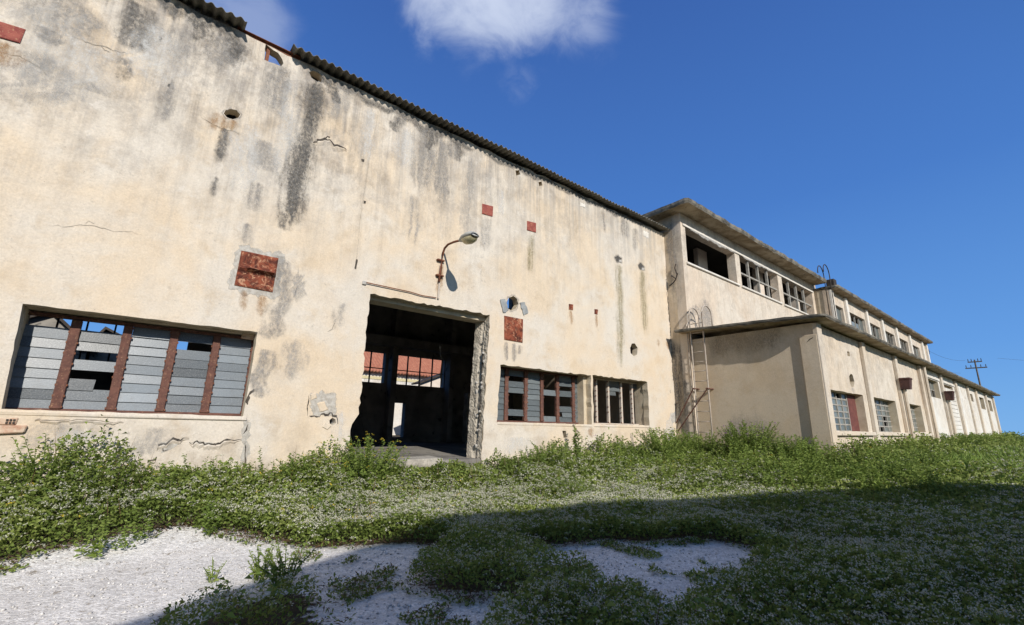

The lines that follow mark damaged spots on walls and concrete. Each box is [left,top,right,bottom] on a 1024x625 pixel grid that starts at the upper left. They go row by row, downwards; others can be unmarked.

leakage [217,129,228,159]
leakage [238,66,340,229]
crack [313,110,378,258]
crack [147,389,255,466]
peeling [309,390,337,430]